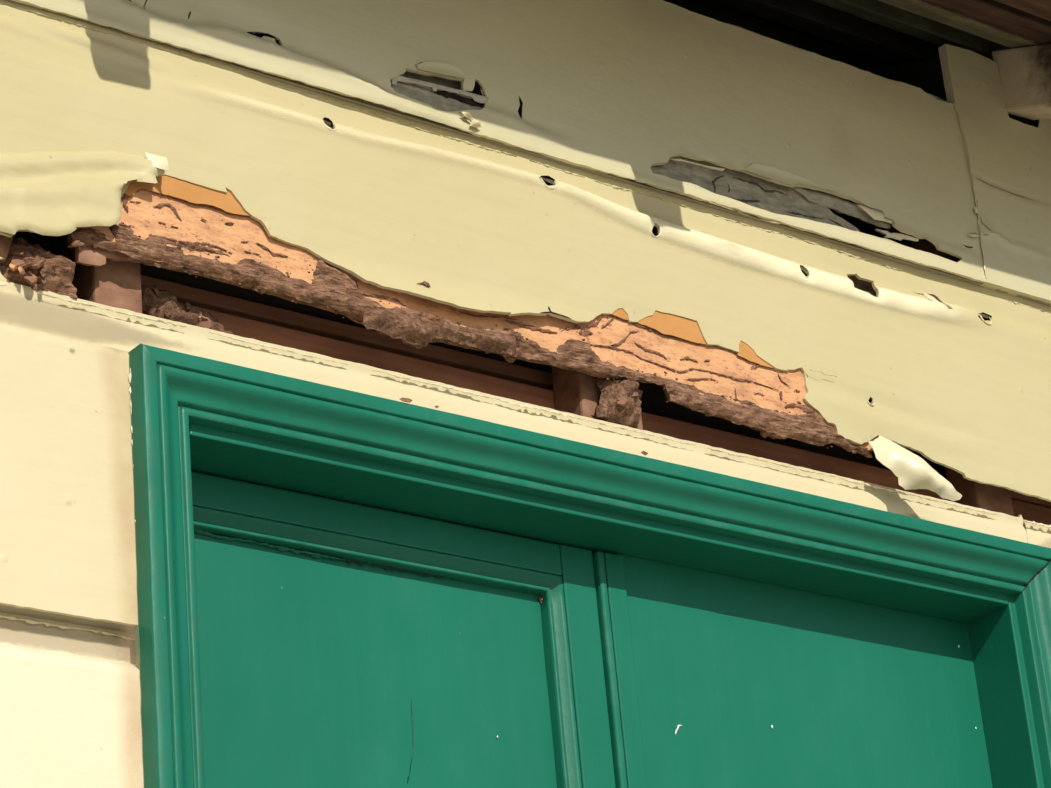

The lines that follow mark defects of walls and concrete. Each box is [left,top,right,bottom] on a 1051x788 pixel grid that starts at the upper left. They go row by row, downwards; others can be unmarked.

peeling [416,62,466,79]
peeling [670,159,725,171]
peeling [744,163,835,192]
peeling [0,150,169,287]
peeling [857,205,892,224]
peeling [198,312,212,329]
peeling [864,434,962,501]